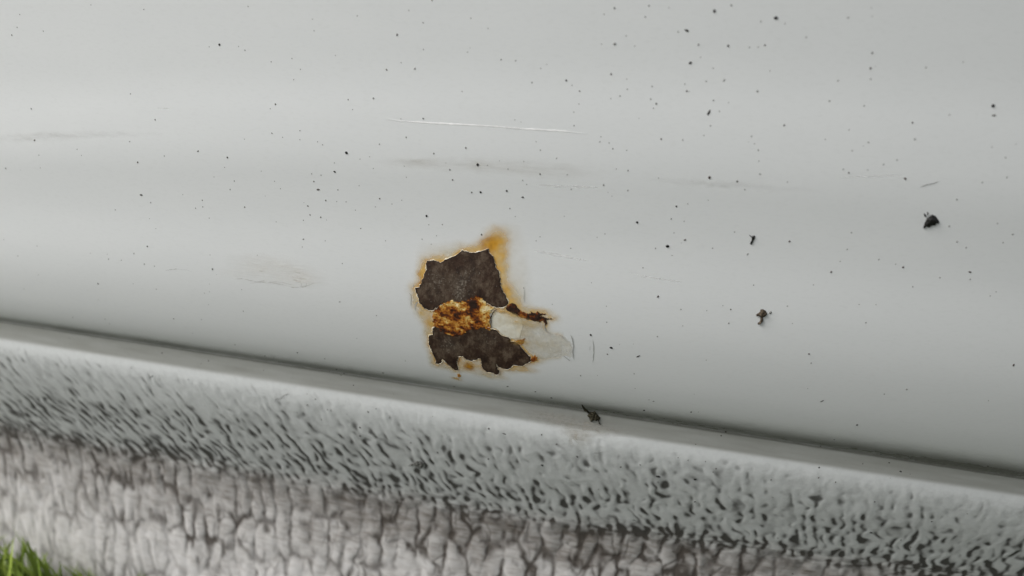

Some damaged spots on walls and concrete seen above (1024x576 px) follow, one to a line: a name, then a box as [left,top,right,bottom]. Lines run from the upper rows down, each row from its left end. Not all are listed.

rust [413,232,574,379]